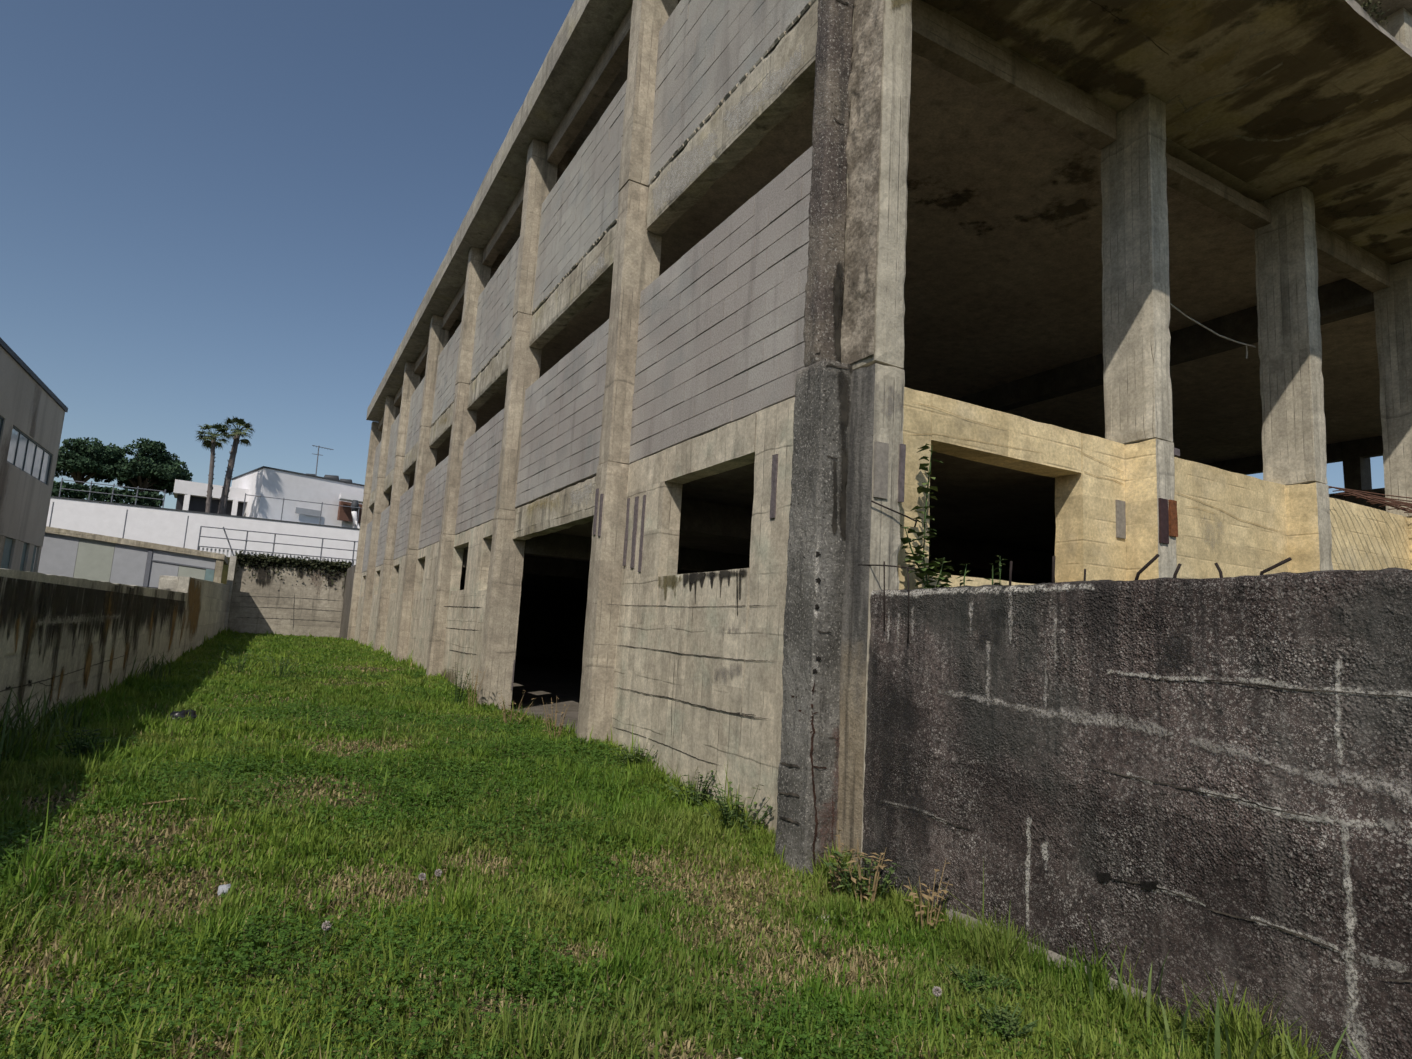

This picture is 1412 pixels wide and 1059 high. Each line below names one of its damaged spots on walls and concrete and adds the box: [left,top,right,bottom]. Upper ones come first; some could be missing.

leakage [892,0,1145,99]
leakage [1233,89,1379,142]
spalling [815,0,884,364]
leakage [832,263,853,540]
leakage [658,569,746,615]
peeling [809,541,821,618]
leakage [0,576,185,714]
crack [596,603,779,765]
crack [1107,669,1412,700]
crack [778,682,840,869]
crack [1087,764,1412,846]
crack [1096,875,1340,952]